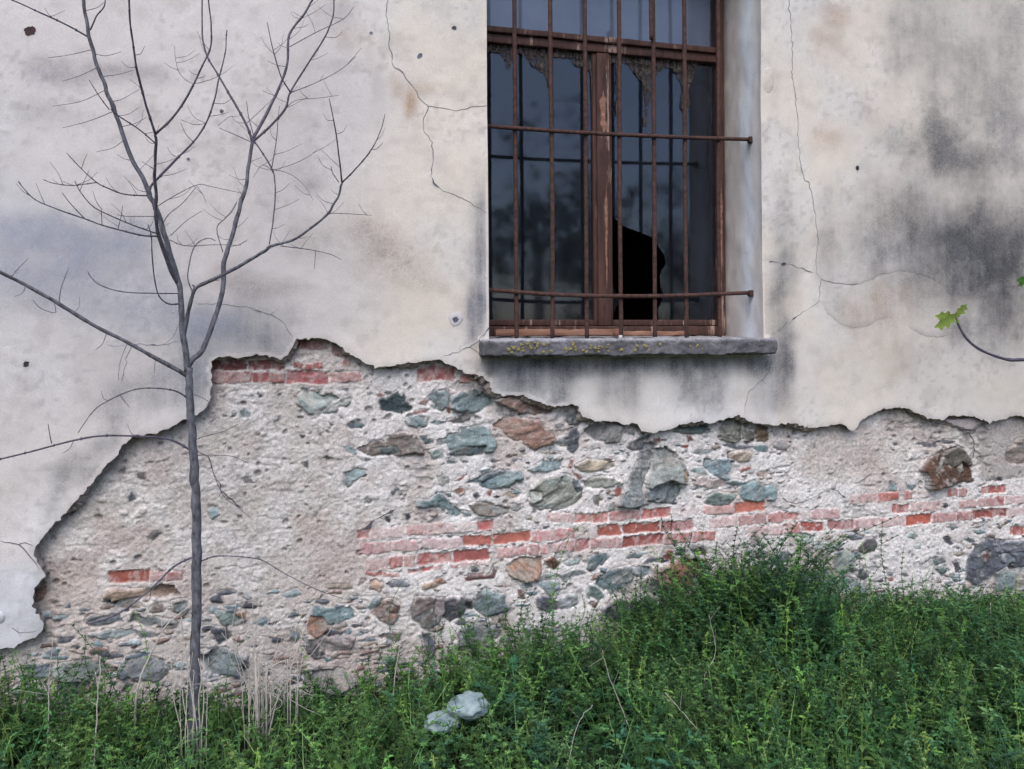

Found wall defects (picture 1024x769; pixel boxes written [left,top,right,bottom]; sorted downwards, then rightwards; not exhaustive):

crack [385,0,487,210]
crack [769,0,857,331]
leakage [949,229,1023,296]
spalling [0,338,1024,727]